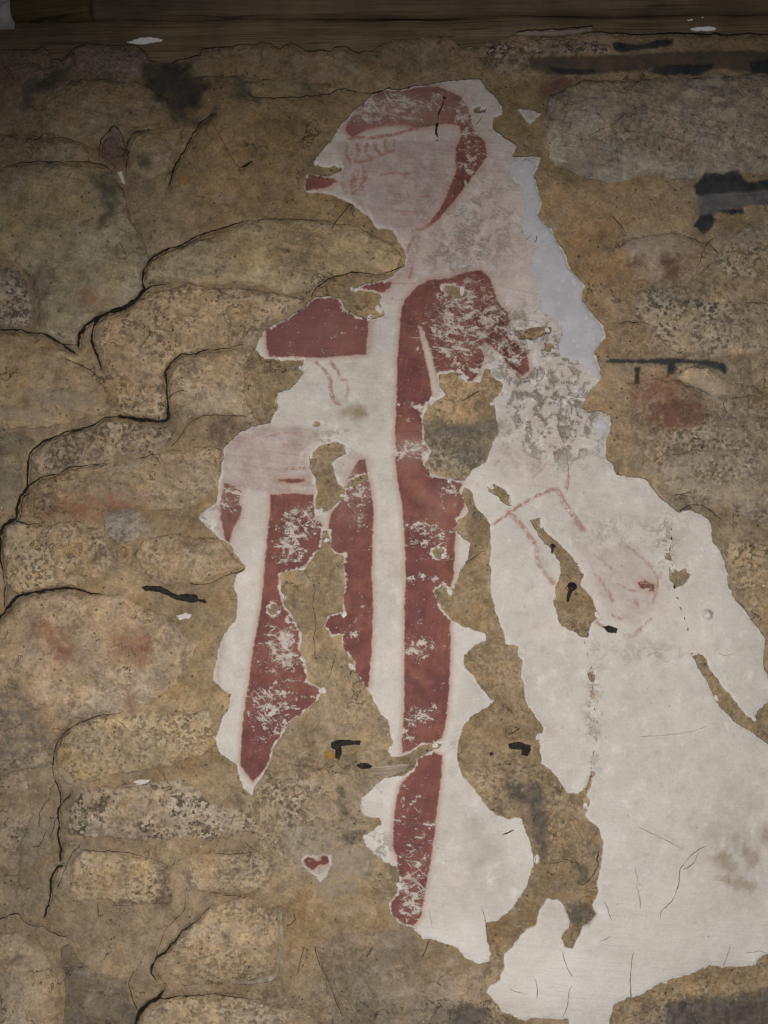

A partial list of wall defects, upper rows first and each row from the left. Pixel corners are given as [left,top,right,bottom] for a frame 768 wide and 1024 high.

crack [165,114,252,186]
crack [0,222,242,378]
crack [311,265,403,297]
flaking render [514,327,554,352]
crack [0,344,247,619]
flaking render [309,442,368,515]
flaking render [665,552,692,588]
flaking render [423,369,603,980]
flaking render [691,652,768,744]
crack [0,713,168,938]
crack [128,893,283,1024]
flaking render [613,954,768,1019]